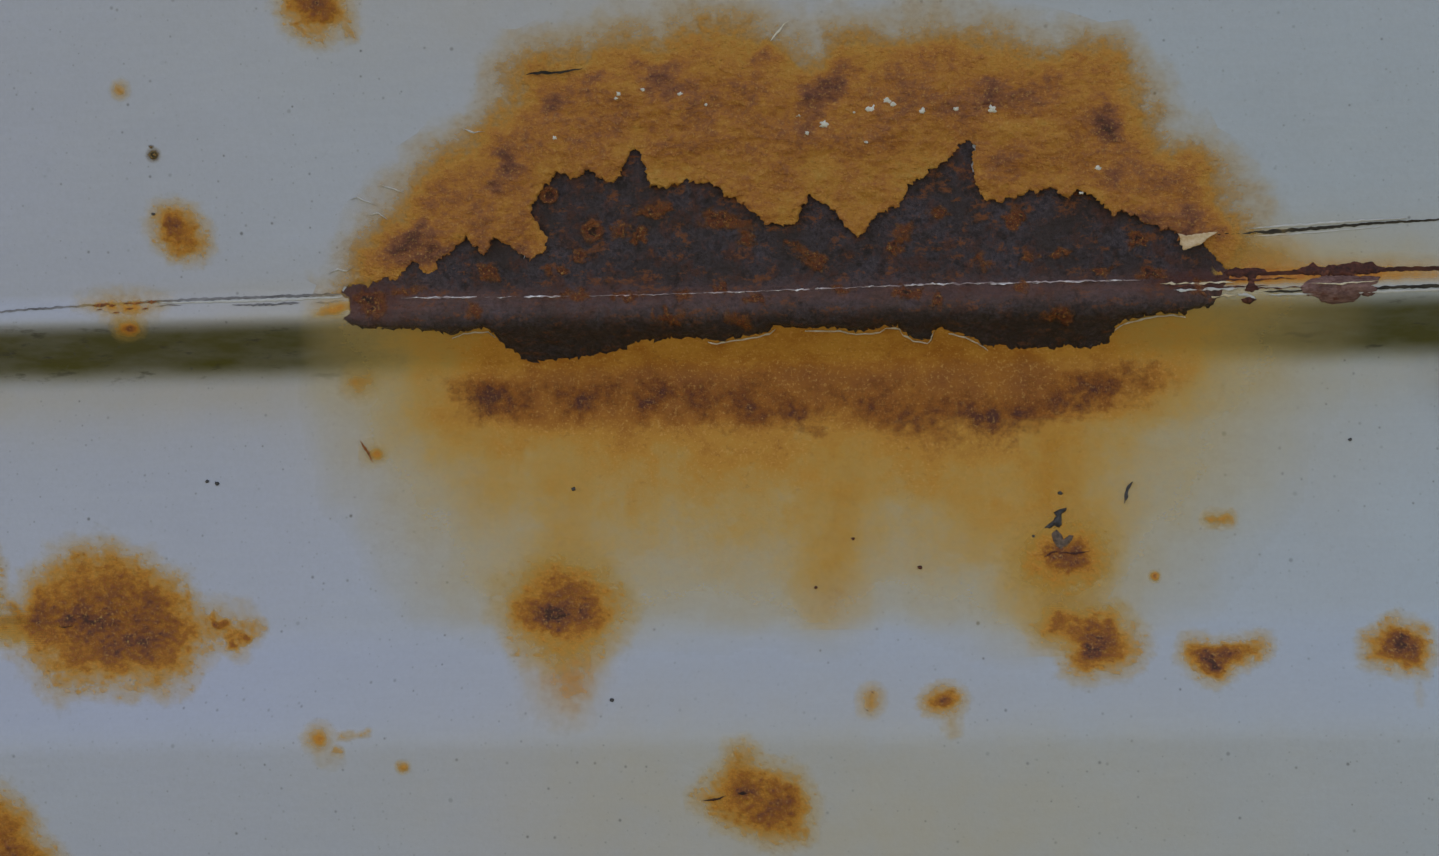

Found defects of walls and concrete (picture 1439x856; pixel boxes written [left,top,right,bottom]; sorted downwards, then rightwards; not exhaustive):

corrosion [280,0,354,44]
corrosion [151,205,209,261]
peeling [341,140,1240,363]
corrosion [1301,275,1380,304]
corrosion [349,274,1271,697]
corrosion [0,544,266,698]
corrosion [1362,616,1433,674]
corrosion [923,685,962,714]
corrosion [0,790,57,856]
corrosion [689,746,815,845]